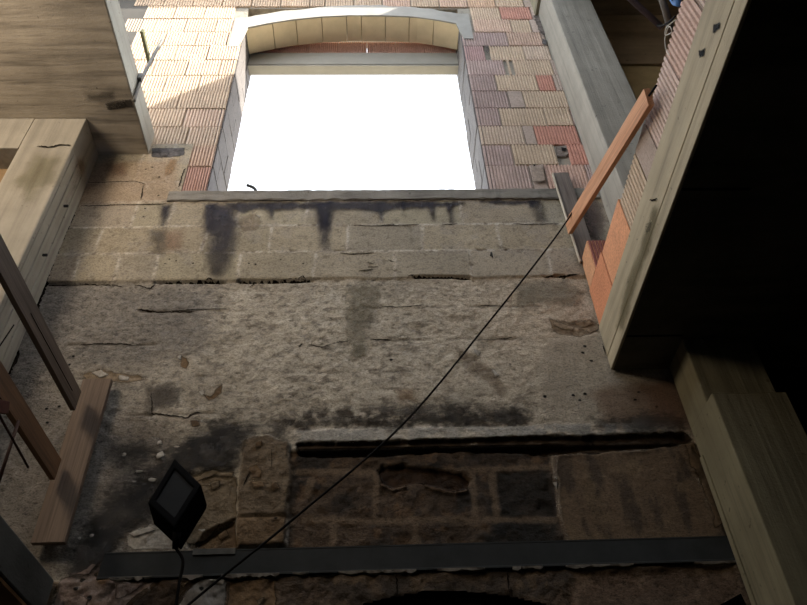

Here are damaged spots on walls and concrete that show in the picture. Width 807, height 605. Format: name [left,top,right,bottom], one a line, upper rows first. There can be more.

water stain [154,206,170,243]
water stain [205,201,464,272]
water stain [480,200,545,221]
crack [31,181,310,391]
crack [8,350,20,374]
flaking render [549,319,599,362]
water stain [184,427,245,471]
spalling [296,431,722,528]